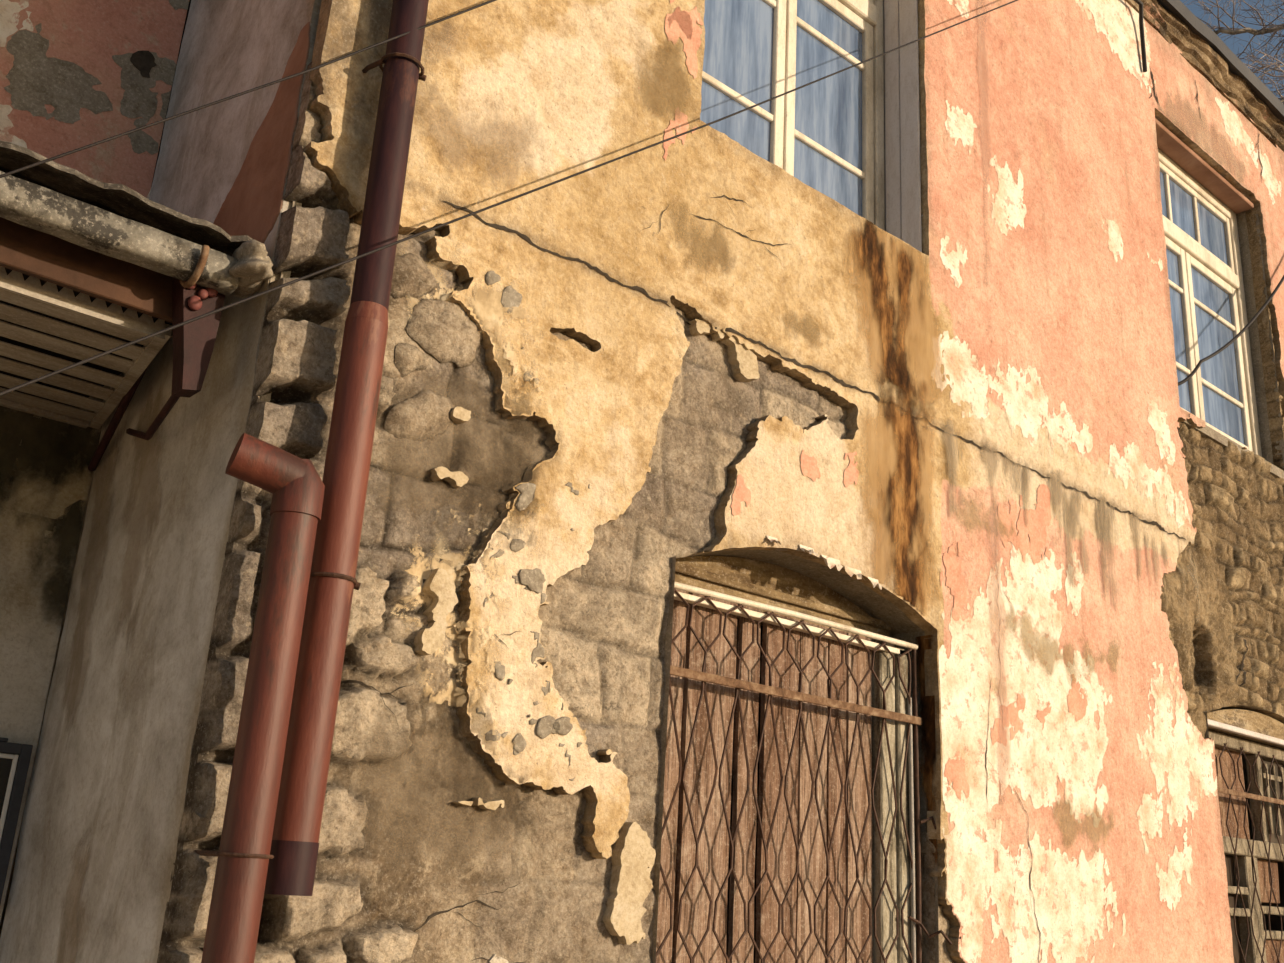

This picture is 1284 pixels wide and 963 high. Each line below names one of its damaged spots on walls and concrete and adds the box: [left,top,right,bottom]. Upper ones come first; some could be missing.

peeling [1075,0,1156,94]
leakage [0,406,102,502]
leakage [37,500,84,619]
flaking render [157,479,273,963]
flaking render [213,22,361,480]
flaking render [254,230,859,963]
crack [443,195,1186,540]
corrosion [849,220,939,611]
leakage [983,443,1030,511]
peeling [920,484,1126,963]
leakage [1051,473,1114,604]
flaking render [1108,193,1284,912]